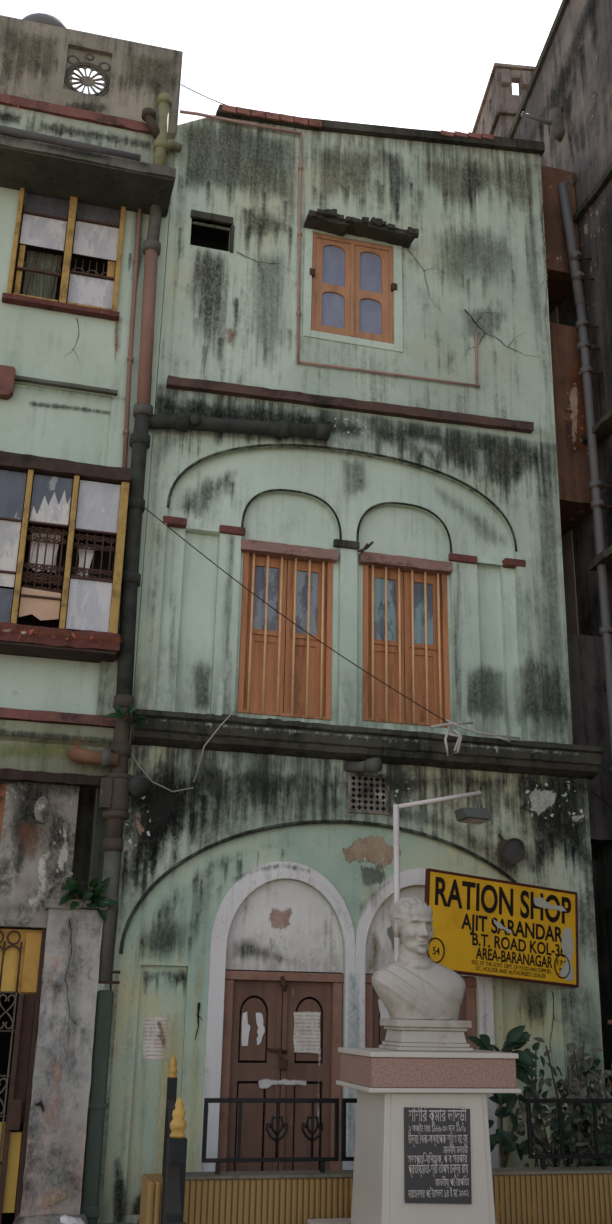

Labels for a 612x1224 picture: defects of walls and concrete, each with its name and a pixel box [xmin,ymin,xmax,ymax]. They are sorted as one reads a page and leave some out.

leakage [384,153,412,211]
crack [407,135,575,381]
leakage [156,398,542,488]
leakage [454,634,503,714]
leakage [519,661,567,721]
leakage [121,768,308,891]
peeling [336,828,405,891]
peeling [526,780,587,826]
leakage [141,906,177,952]
peeling [270,909,291,930]
crack [61,920,76,1076]